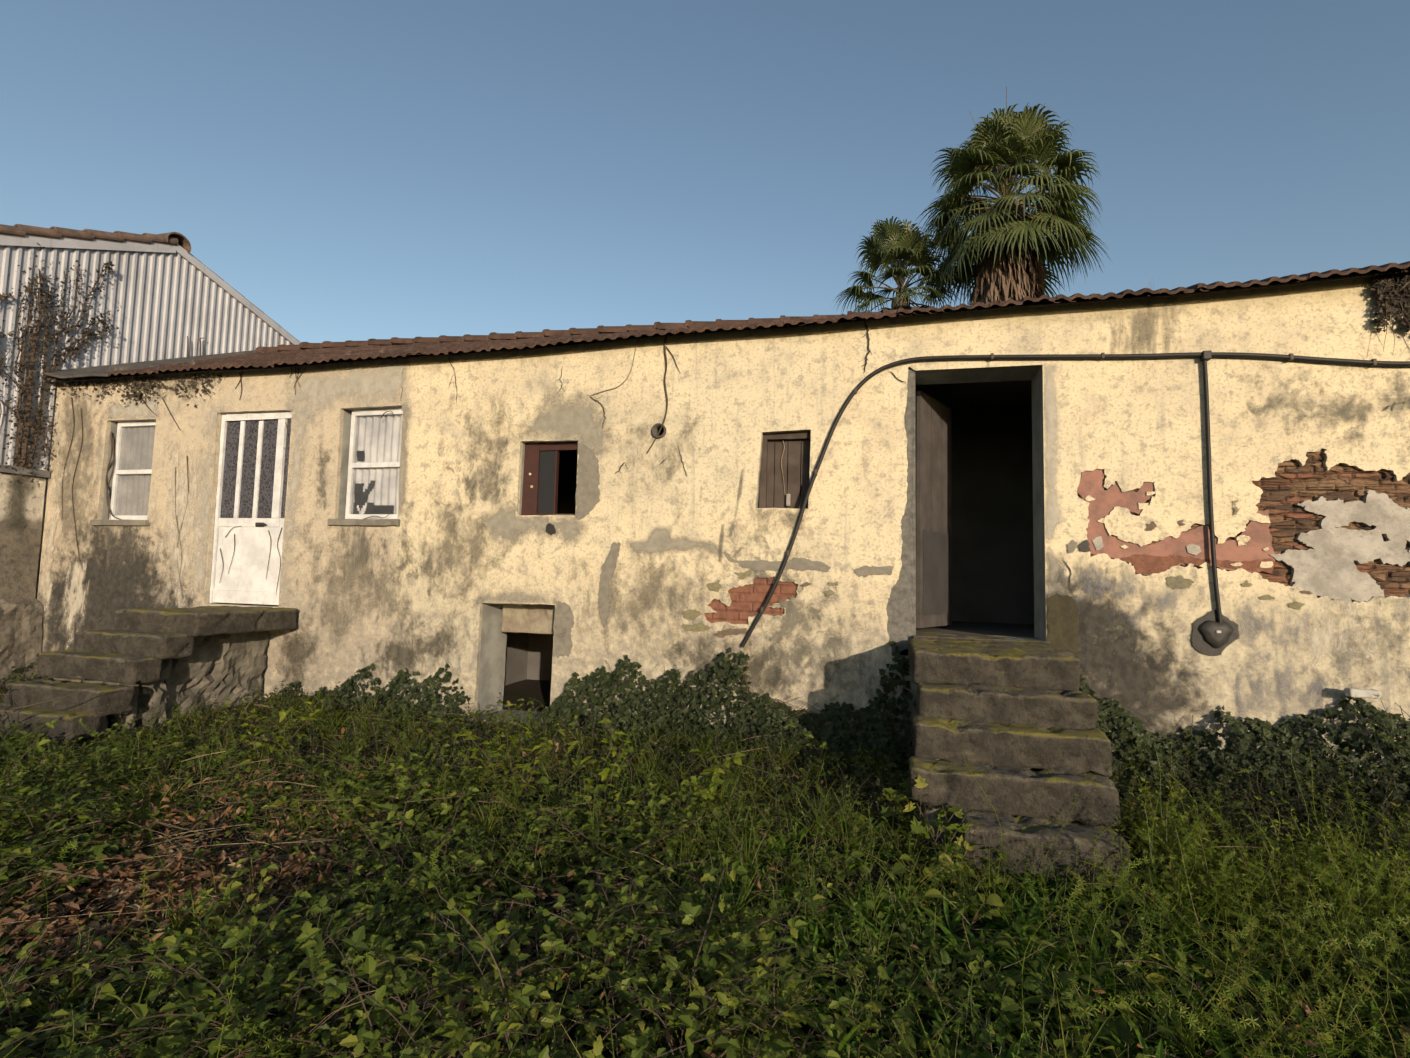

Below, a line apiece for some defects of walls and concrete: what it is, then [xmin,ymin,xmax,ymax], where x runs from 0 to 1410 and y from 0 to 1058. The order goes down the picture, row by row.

flaking render [682,570,838,638]
water stain [1046,565,1207,738]
flaking render [1066,450,1410,610]
water stain [1333,618,1404,680]